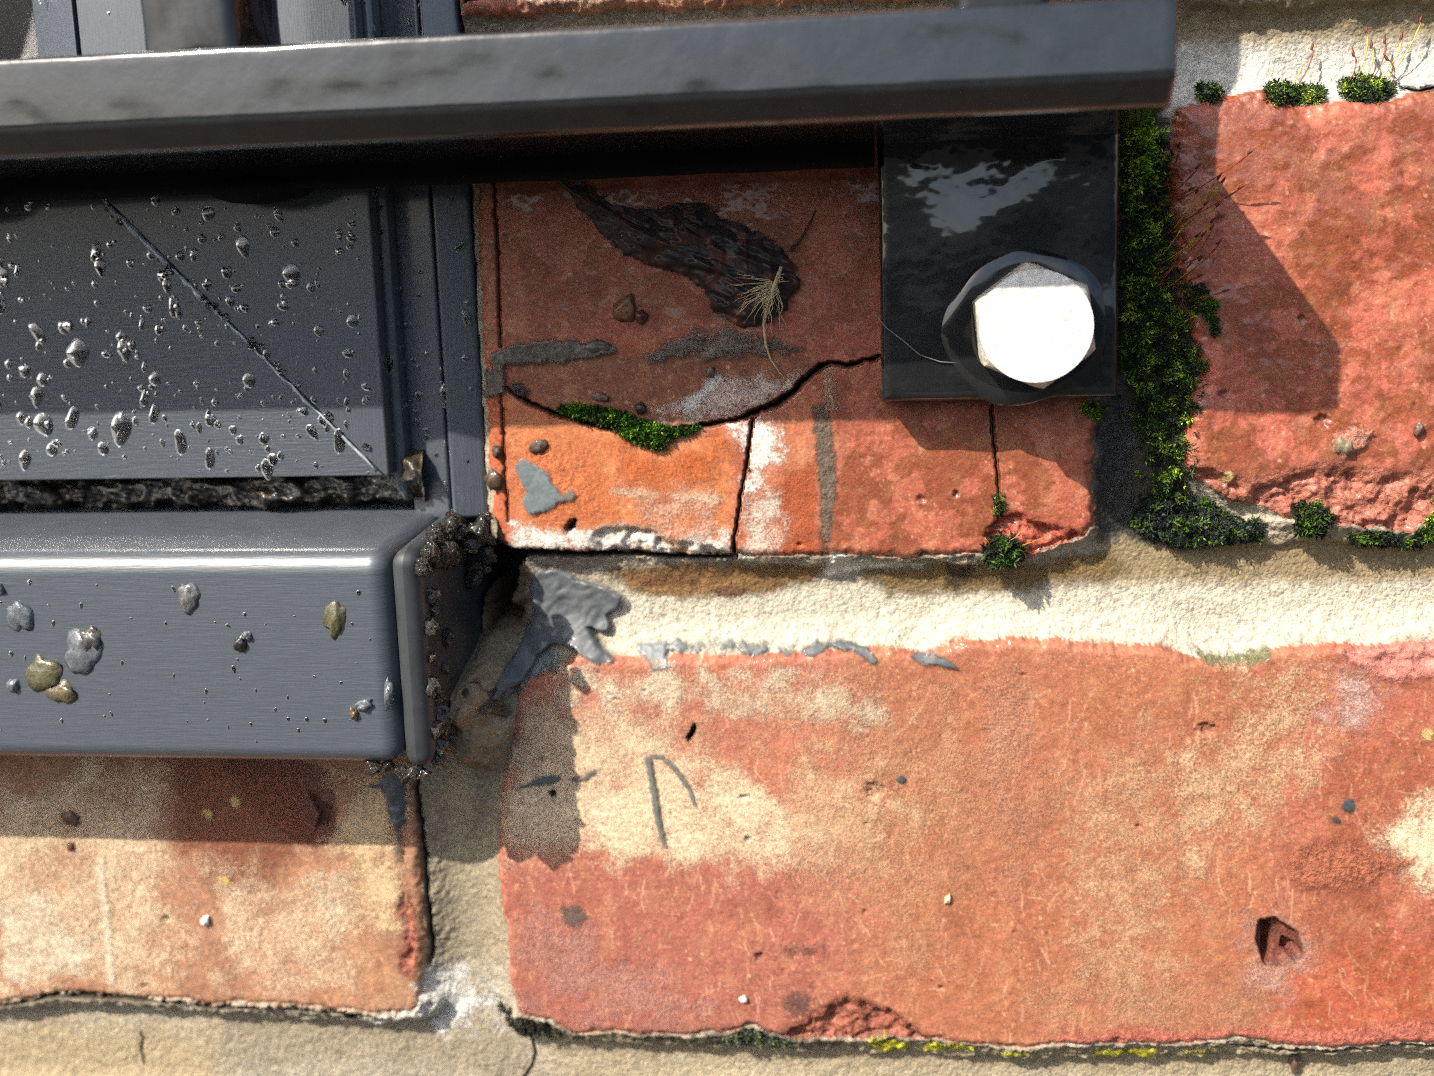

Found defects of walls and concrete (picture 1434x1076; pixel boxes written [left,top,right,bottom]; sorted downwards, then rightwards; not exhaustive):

crack [492,183,503,347]
crack [499,355,881,560]
water stain [361,961,537,1040]
water stain [512,901,715,1033]
spalling [784,994,927,1039]
spalling [1256,916,1302,965]
crack [524,1037,538,1076]